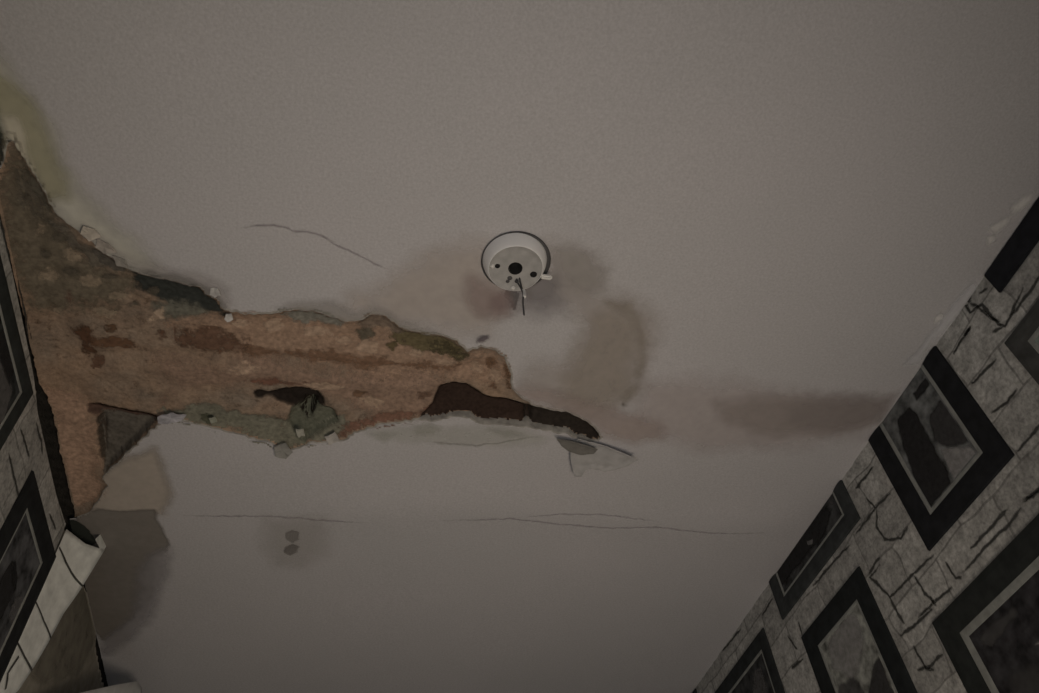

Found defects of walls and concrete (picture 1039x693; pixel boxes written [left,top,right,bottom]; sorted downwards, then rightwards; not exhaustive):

flaking render [0,138,603,517]
water stain [380,254,494,324]